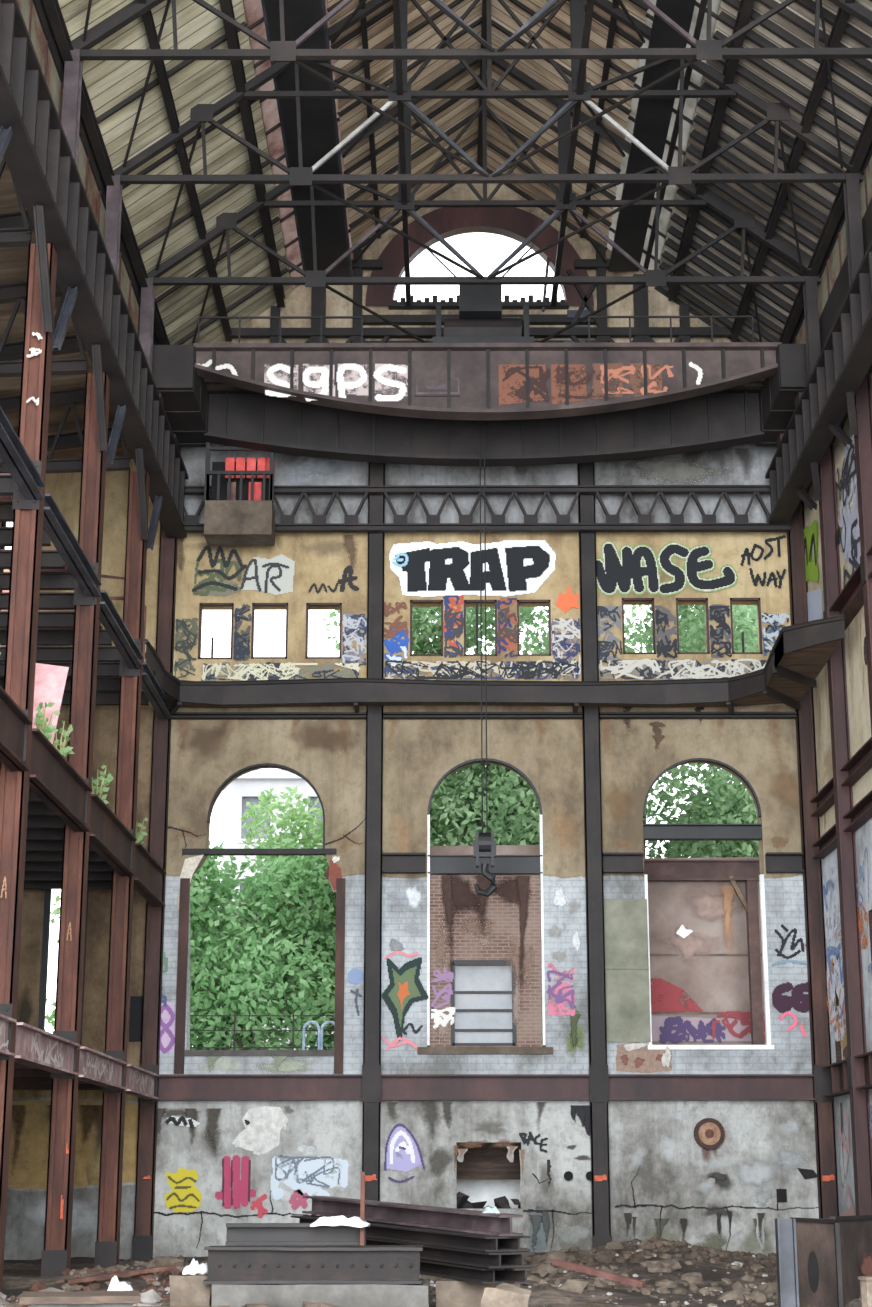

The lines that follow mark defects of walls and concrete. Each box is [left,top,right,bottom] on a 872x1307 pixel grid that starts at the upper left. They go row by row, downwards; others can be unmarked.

peeling [509,944,531,1022]